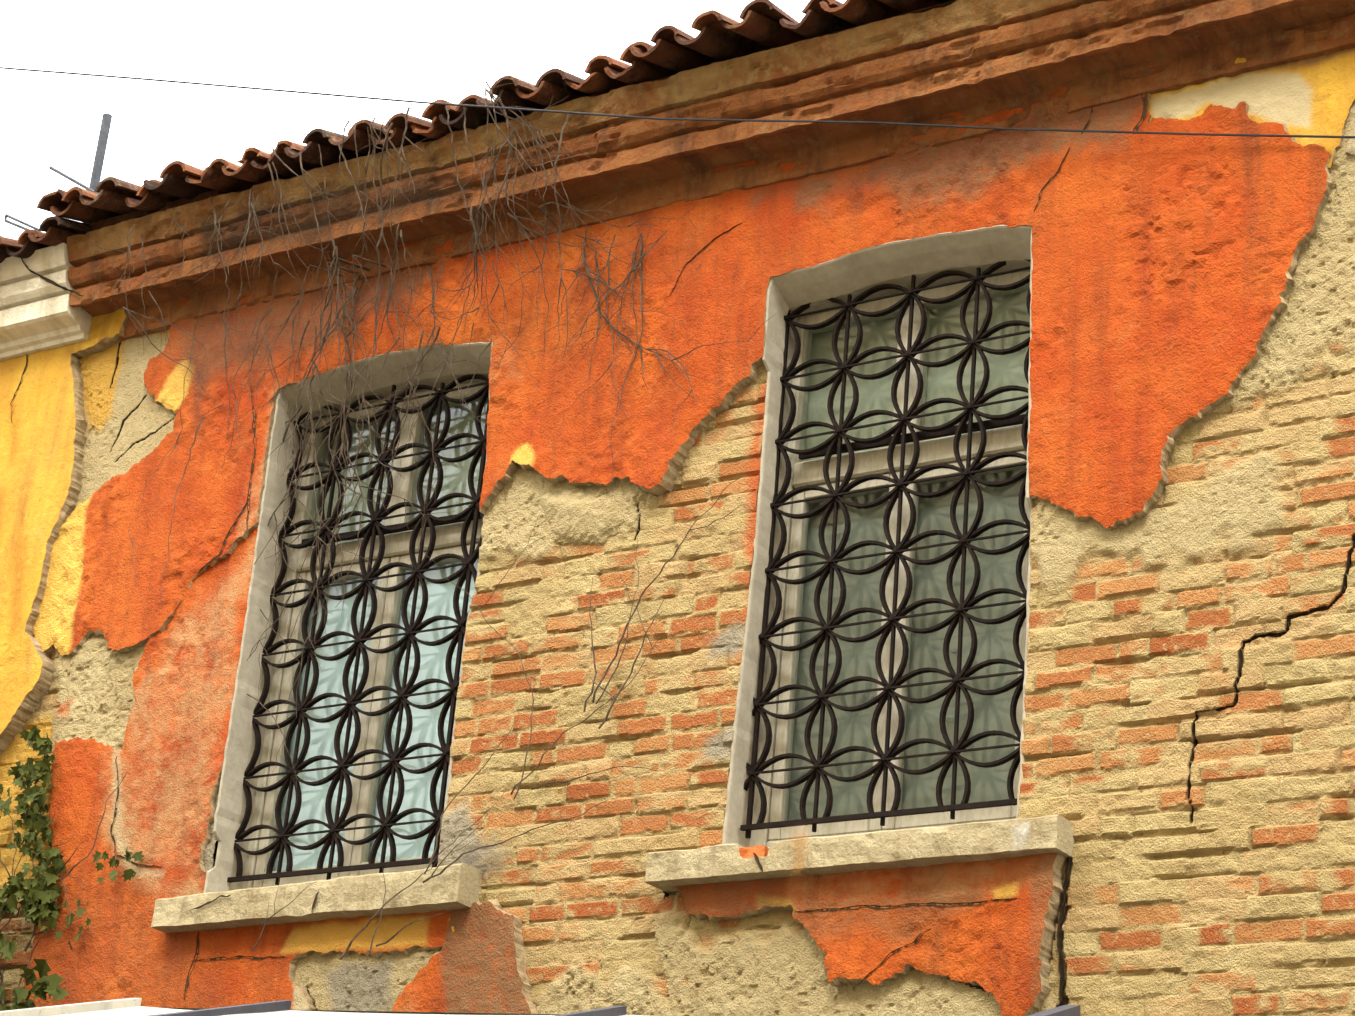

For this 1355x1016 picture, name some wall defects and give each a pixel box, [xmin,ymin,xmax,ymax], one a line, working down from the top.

spalling [76,330,176,507]
spalling [437,366,1000,1016]
spalling [1018,102,1355,1016]
crack [1188,535,1355,823]
spalling [295,946,441,1011]